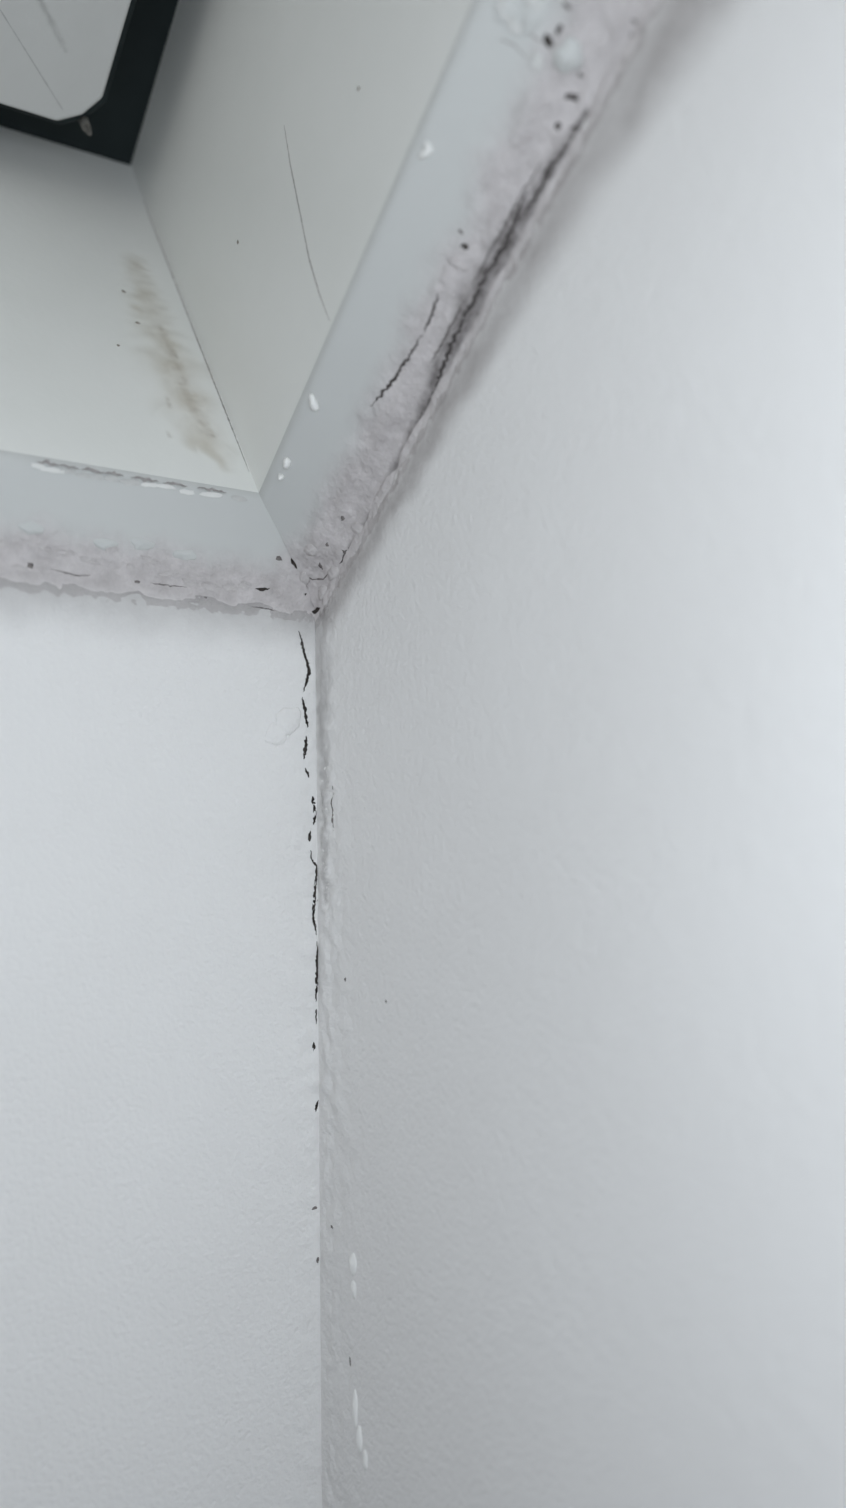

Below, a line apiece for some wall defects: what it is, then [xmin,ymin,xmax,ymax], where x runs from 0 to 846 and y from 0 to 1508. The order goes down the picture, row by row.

crack [371,110,587,465]
crack [251,516,363,1051]